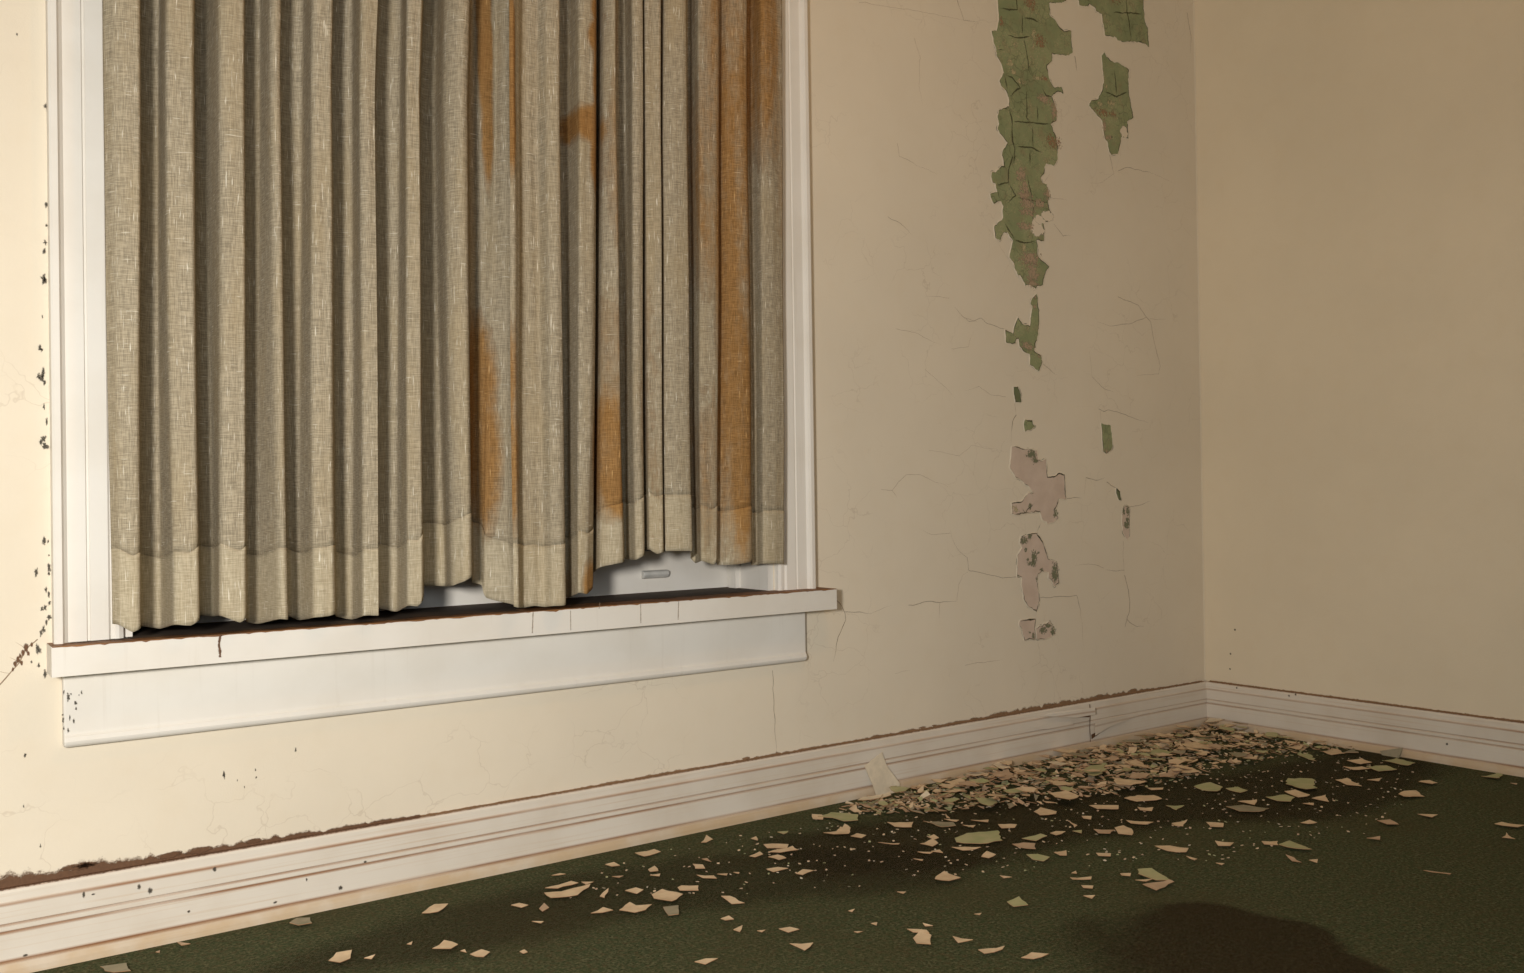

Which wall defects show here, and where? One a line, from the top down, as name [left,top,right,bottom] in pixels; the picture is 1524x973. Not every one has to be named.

peeling [989,0,1150,373]
peeling [1009,386,1067,642]
crack [0,639,38,685]